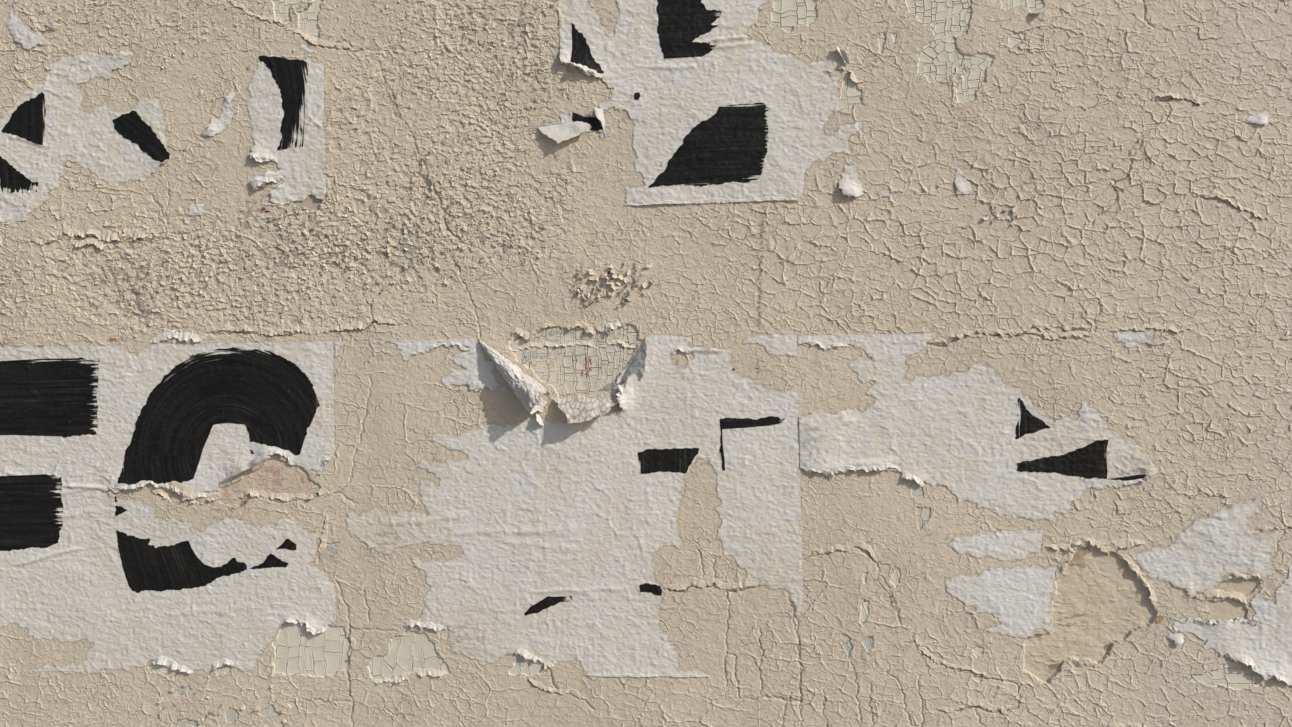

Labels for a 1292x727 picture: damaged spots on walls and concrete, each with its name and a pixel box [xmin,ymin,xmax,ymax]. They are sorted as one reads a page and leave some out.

peeling [836,64,865,111]
peeling [905,0,996,104]
crack [31,185,189,250]
peeling [35,0,570,339]
crack [227,0,480,333]
crack [149,299,405,344]
peeling [508,262,657,399]
crack [929,305,1195,347]
crack [162,409,367,561]
peeling [147,623,356,727]
peeling [367,630,451,685]
crack [803,540,1018,727]